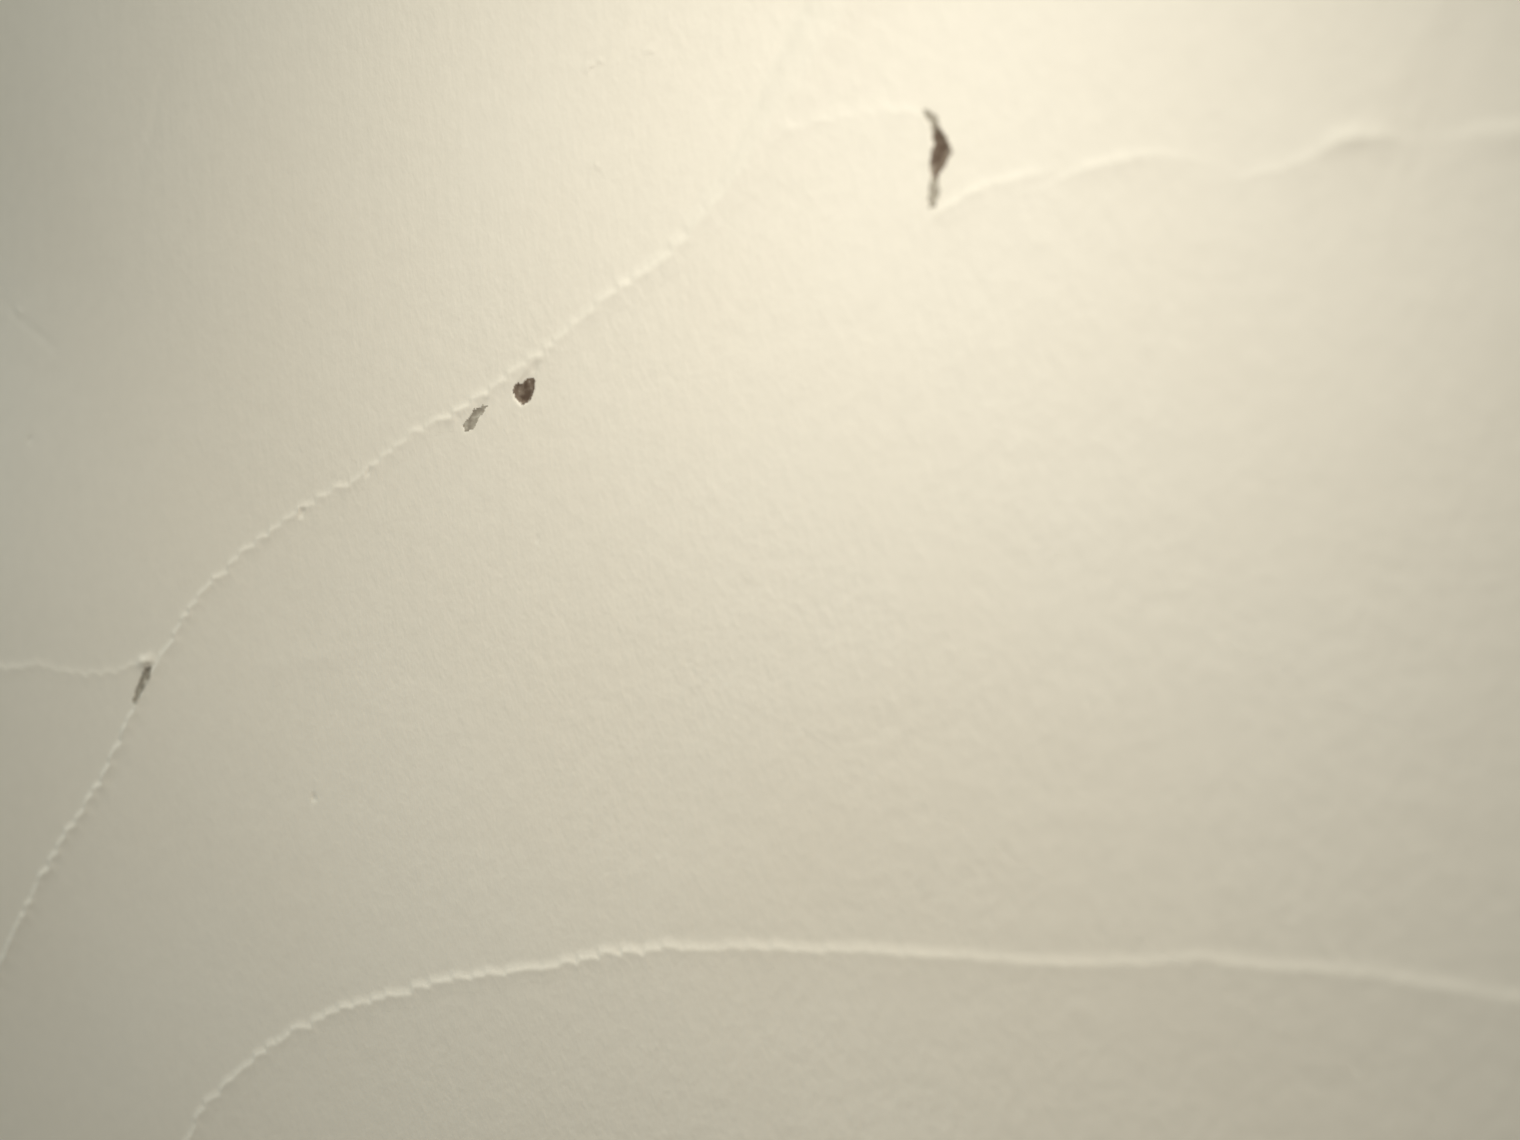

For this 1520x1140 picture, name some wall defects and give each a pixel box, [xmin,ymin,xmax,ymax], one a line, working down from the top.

crack [910,93,1520,228]